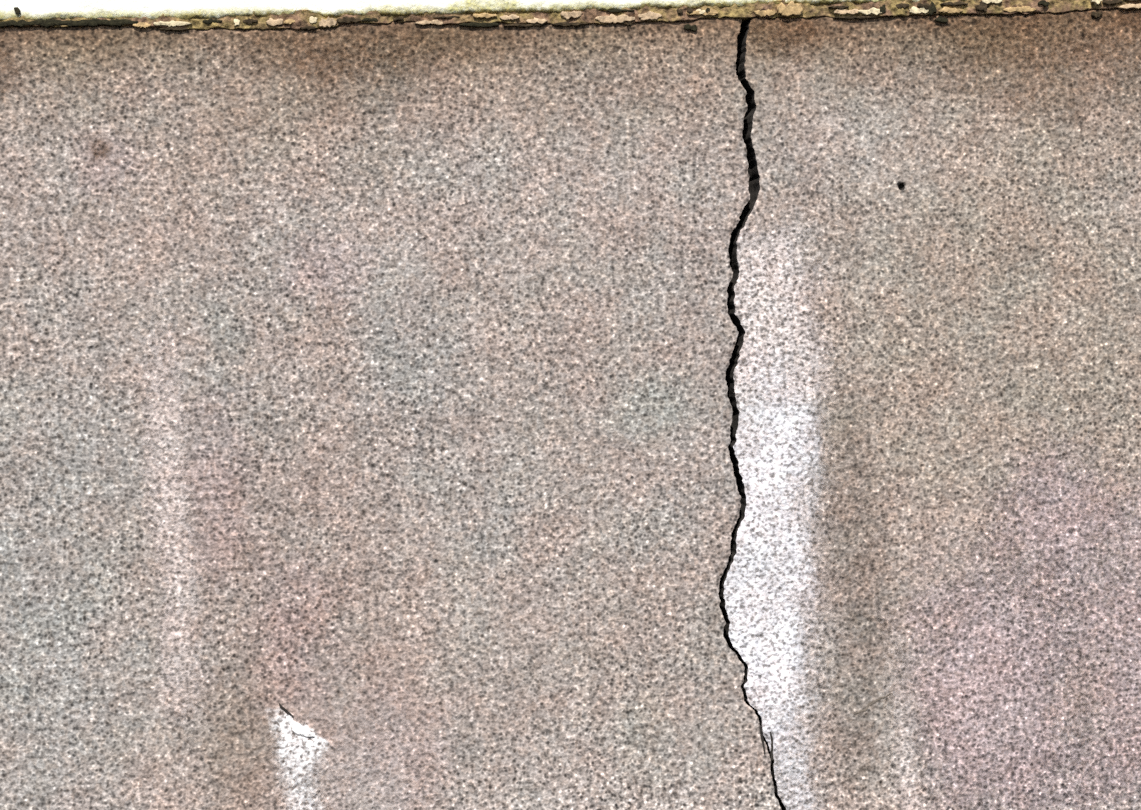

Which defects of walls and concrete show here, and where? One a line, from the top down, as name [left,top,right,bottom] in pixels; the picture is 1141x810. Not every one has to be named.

crack [718,18,786,810]